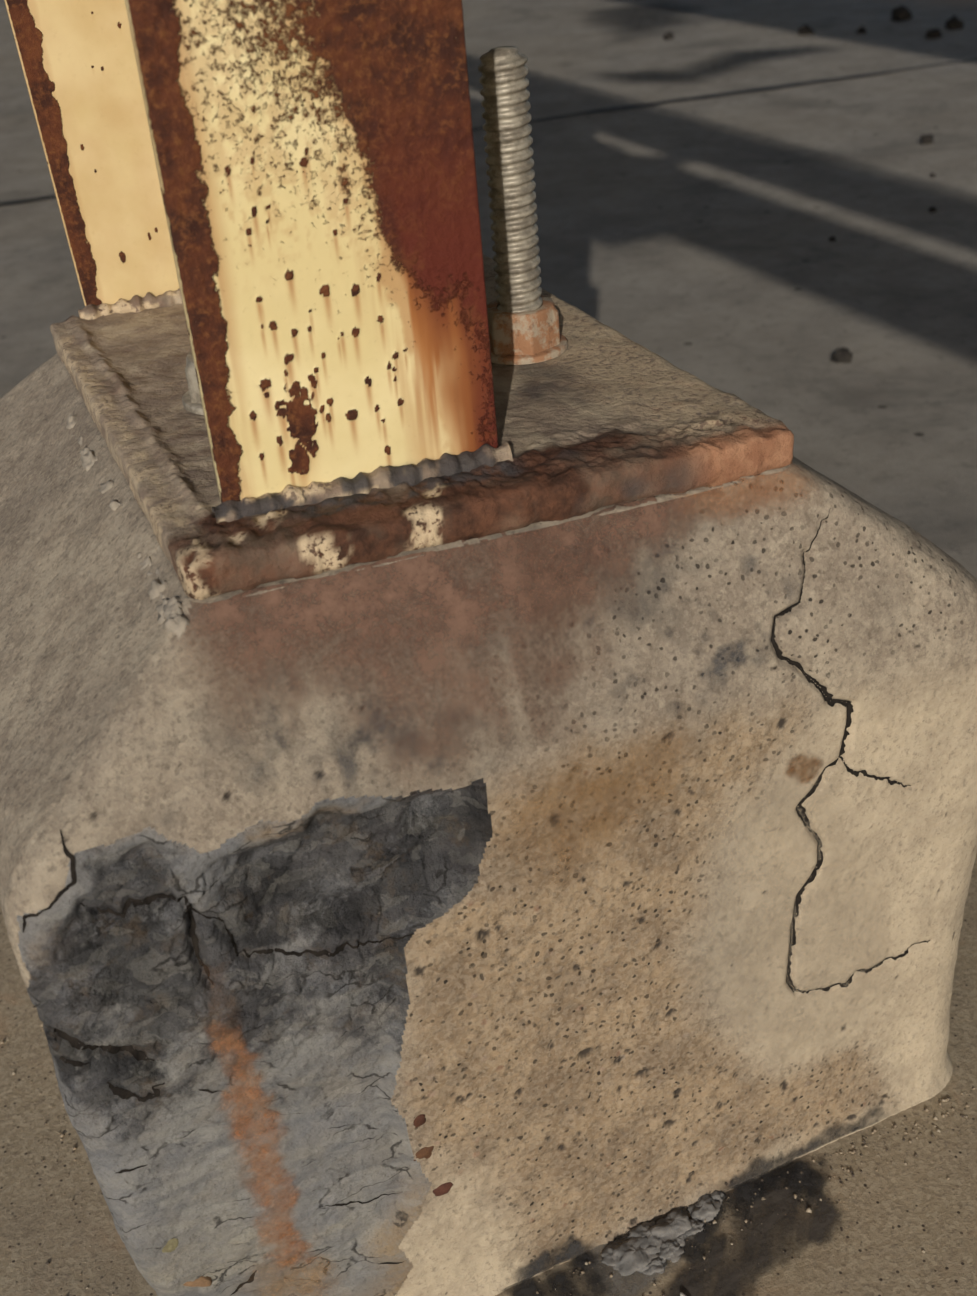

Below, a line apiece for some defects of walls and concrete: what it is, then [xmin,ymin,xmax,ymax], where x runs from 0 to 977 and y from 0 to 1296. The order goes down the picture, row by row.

crack [22,830,413,985]
spalling [17,778,493,1296]
water stain [520,1110,878,1296]
crack [771,510,930,994]